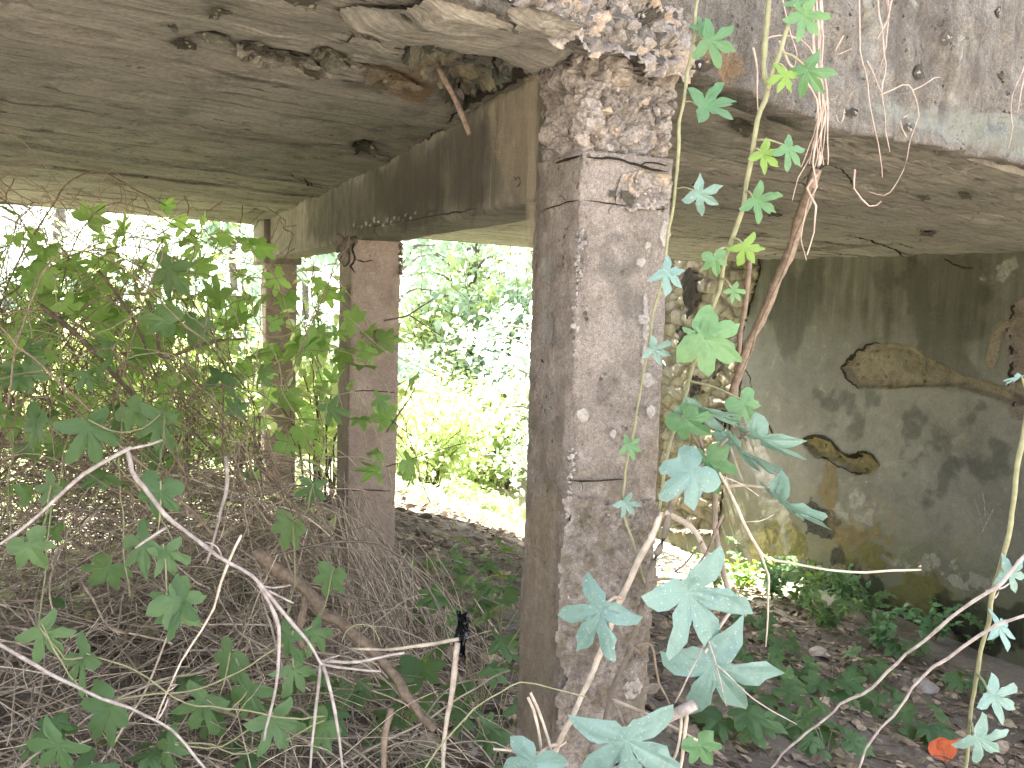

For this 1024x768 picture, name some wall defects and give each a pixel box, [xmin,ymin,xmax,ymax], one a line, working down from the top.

spalling [168,7,531,135]
spalling [508,0,716,84]
crack [555,155,667,172]
crack [543,196,664,215]
spalling [840,297,1024,420]
spalling [802,434,880,476]
leakage [803,497,846,565]